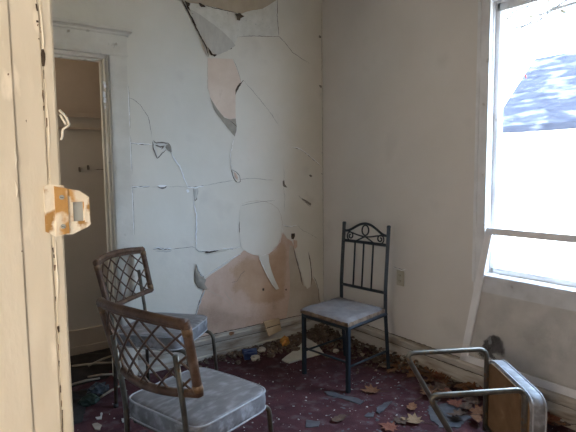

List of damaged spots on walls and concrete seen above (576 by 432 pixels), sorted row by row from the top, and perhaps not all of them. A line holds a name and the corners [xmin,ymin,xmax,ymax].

spalling [182,0,279,136]
crack [153,152,265,254]
peeling [194,233,321,337]
damp [479,334,506,360]